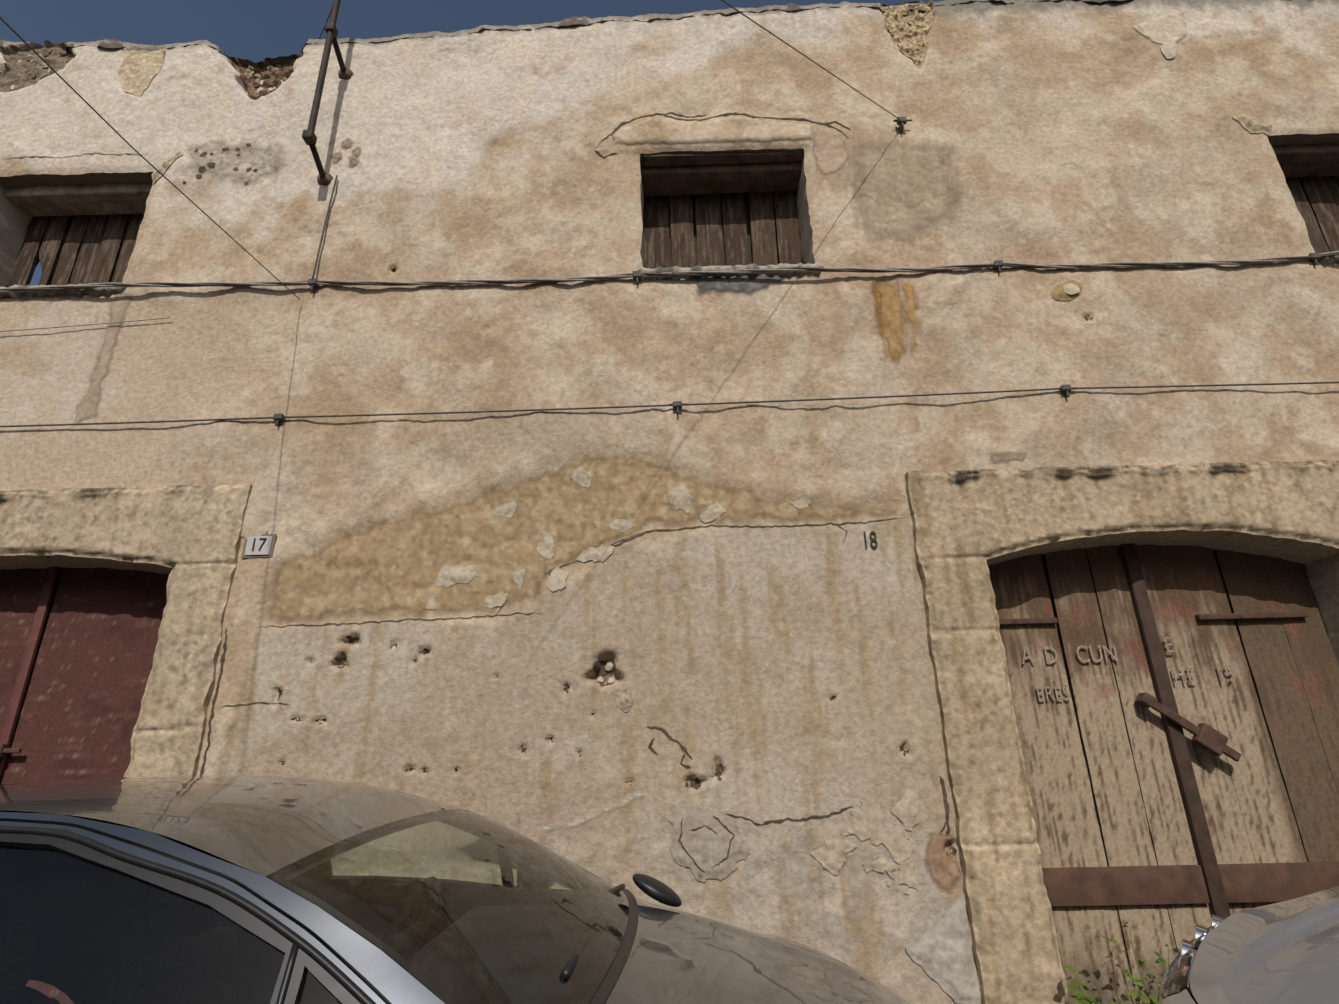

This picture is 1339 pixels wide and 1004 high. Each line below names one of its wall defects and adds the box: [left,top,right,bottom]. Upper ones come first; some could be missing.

spalling [880,0,934,69]
spalling [0,43,75,93]
spalling [217,39,308,100]
crack [595,112,851,158]
spalling [268,456,896,619]
crack [647,726,692,768]
crack [727,806,853,825]